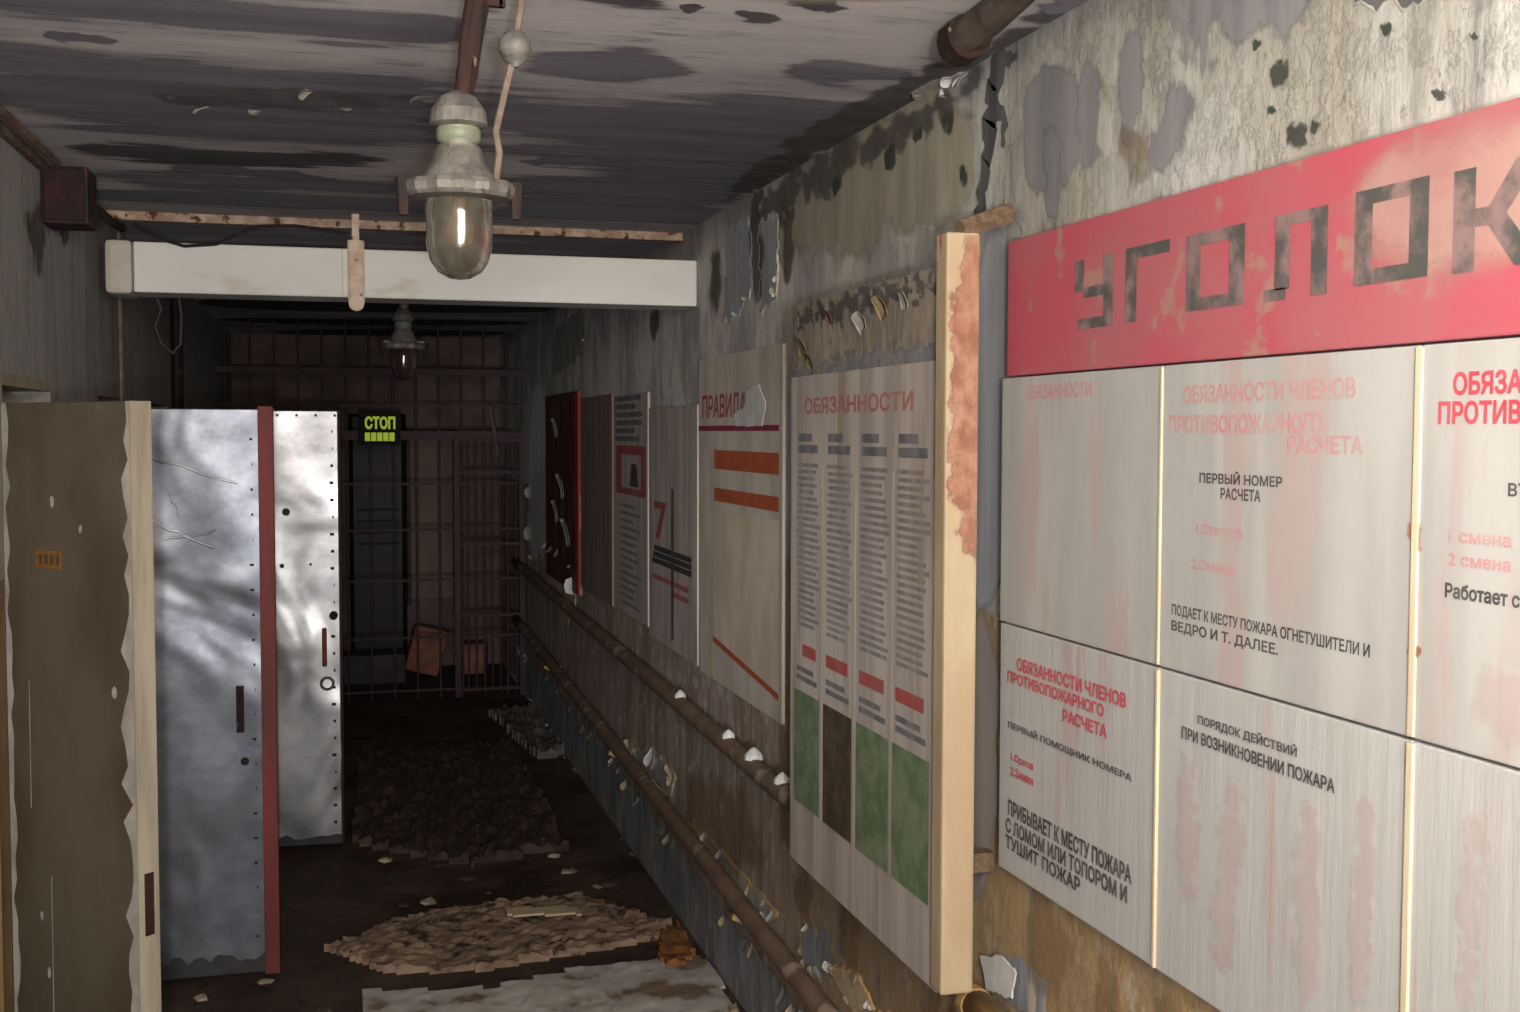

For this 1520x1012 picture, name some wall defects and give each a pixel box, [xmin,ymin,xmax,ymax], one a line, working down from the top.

peeling [152,87,429,115]
peeling [911,72,968,99]
peeling [509,636,804,1012]
peeling [797,922,891,1012]
peeling [980,954,1049,1012]